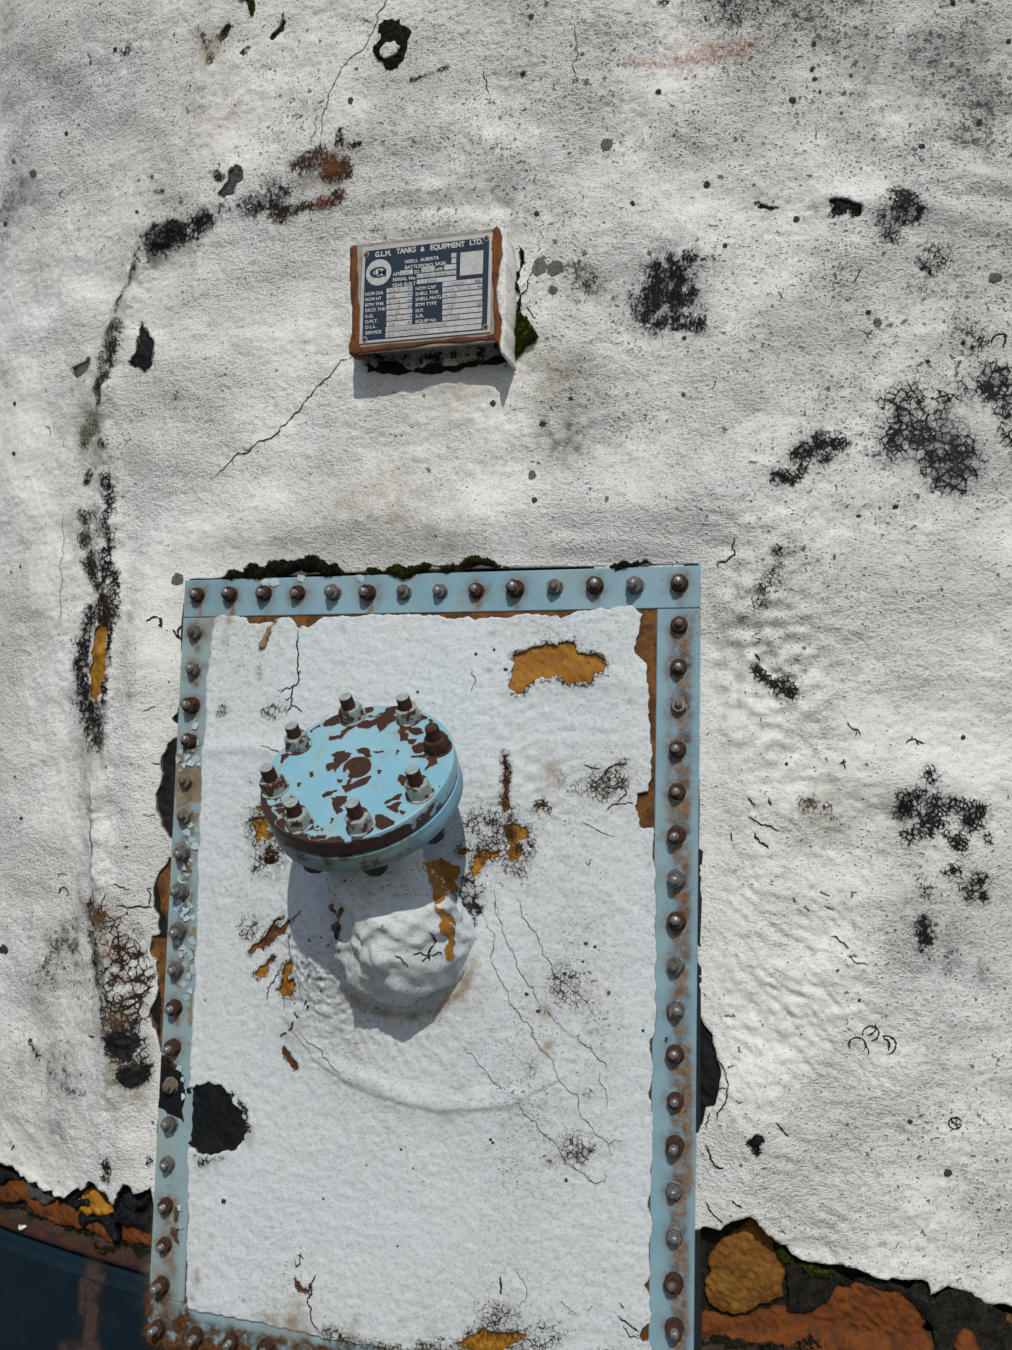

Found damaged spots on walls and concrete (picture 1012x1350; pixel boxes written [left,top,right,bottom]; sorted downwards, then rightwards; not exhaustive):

crack [409,63,449,83]
crack [46,0,386,755]
peeling [507,638,610,697]
peeling [246,915,322,1001]
peeling [307,903,344,952]
peeling [107,1031,247,1155]
rust [667,1016,692,1271]
rust [143,1285,341,1350]
peeling [450,1324,530,1350]